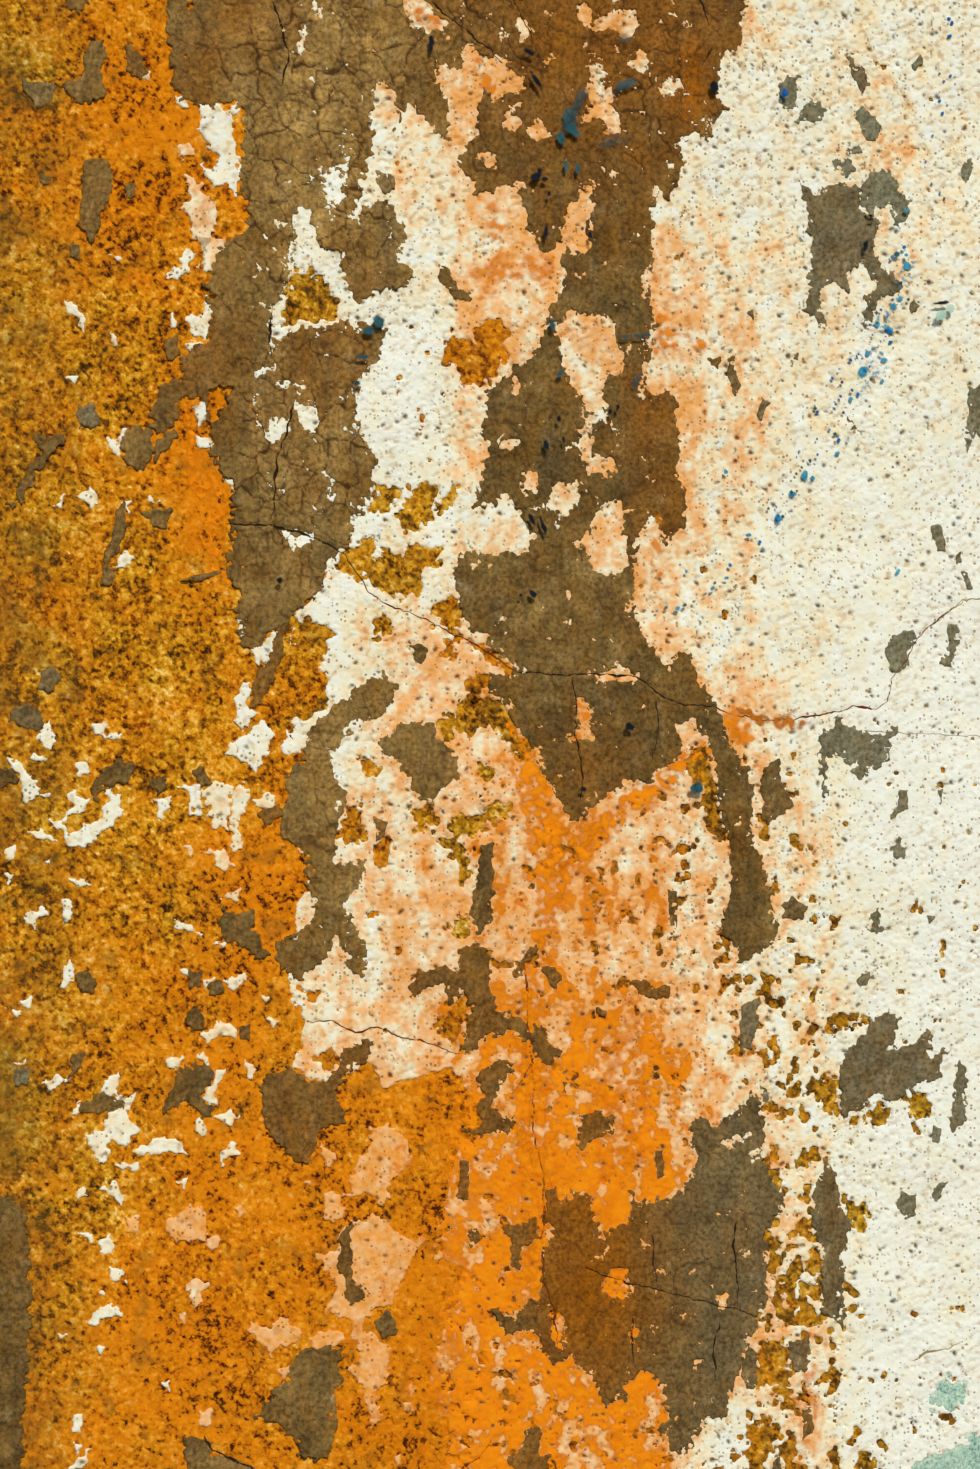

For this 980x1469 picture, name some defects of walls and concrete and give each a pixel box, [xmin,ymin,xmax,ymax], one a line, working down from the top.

crack [272,1,290,86]
crack [432,2,500,61]
peeling [798,53,920,329]
crack [266,306,274,354]
rust [182,407,230,584]
crack [228,405,980,800]
flaking render [0,0,784,1469]
rust [723,706,806,745]
peeling [760,758,794,825]
peeling [817,716,898,798]
rust [403,722,712,1469]
peeling [477,1009,969,1455]